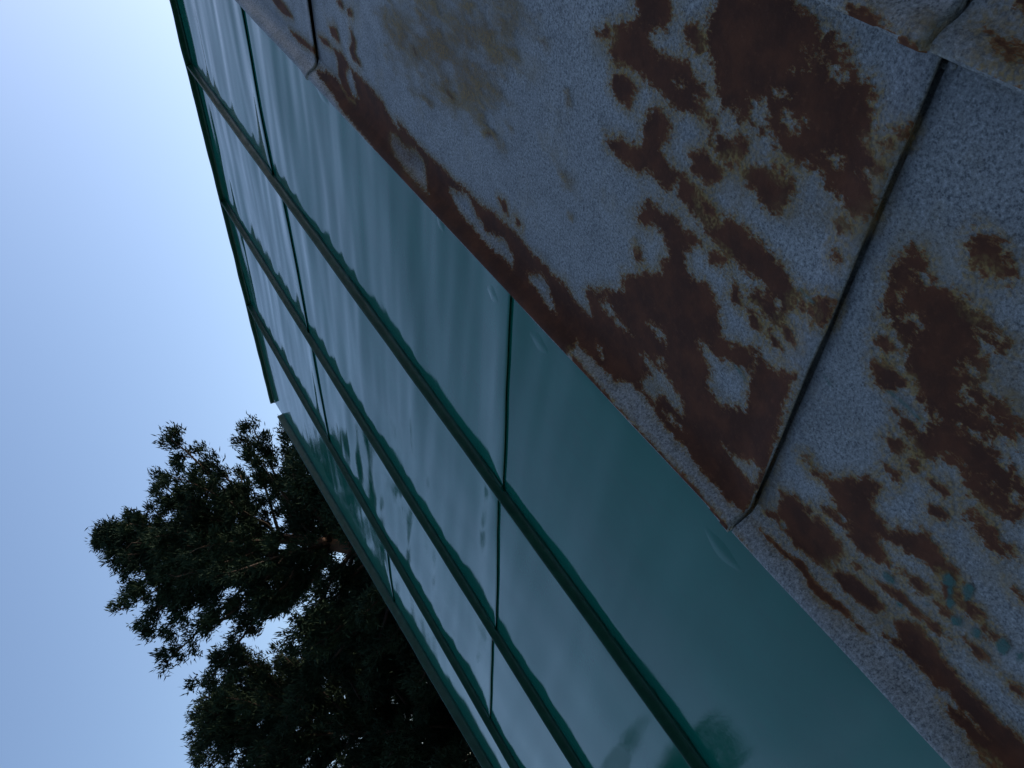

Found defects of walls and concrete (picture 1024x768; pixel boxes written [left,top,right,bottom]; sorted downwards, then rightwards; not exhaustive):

rust [272,0,1024,768]